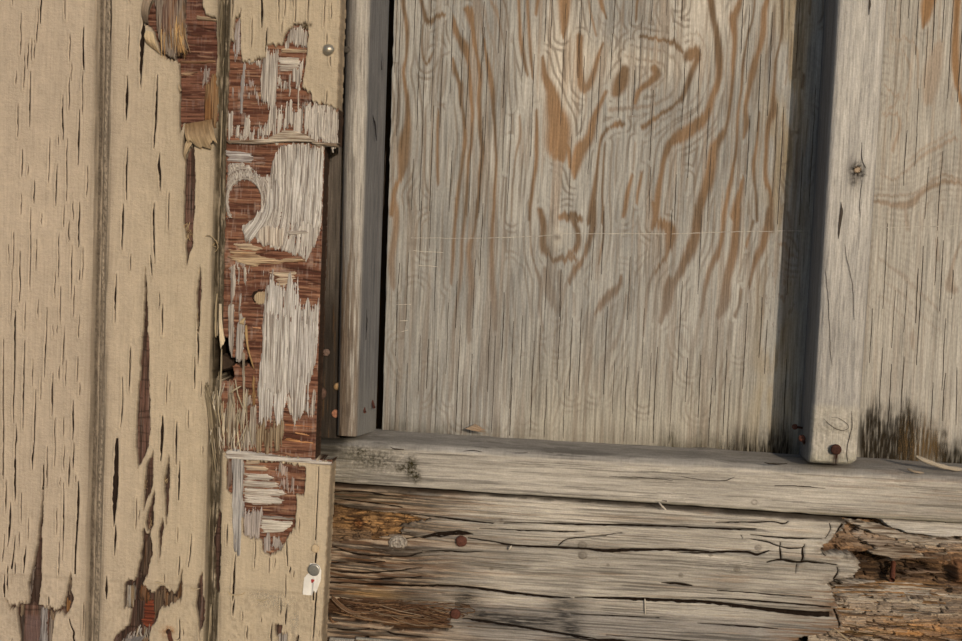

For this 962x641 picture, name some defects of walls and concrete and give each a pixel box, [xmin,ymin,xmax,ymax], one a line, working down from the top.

crack [825,0,962,441]
peeling [141,0,340,556]
crack [110,0,843,641]
water stain [860,405,962,464]
spalling [12,567,74,641]
crack [69,576,108,641]
spalling [114,530,183,641]